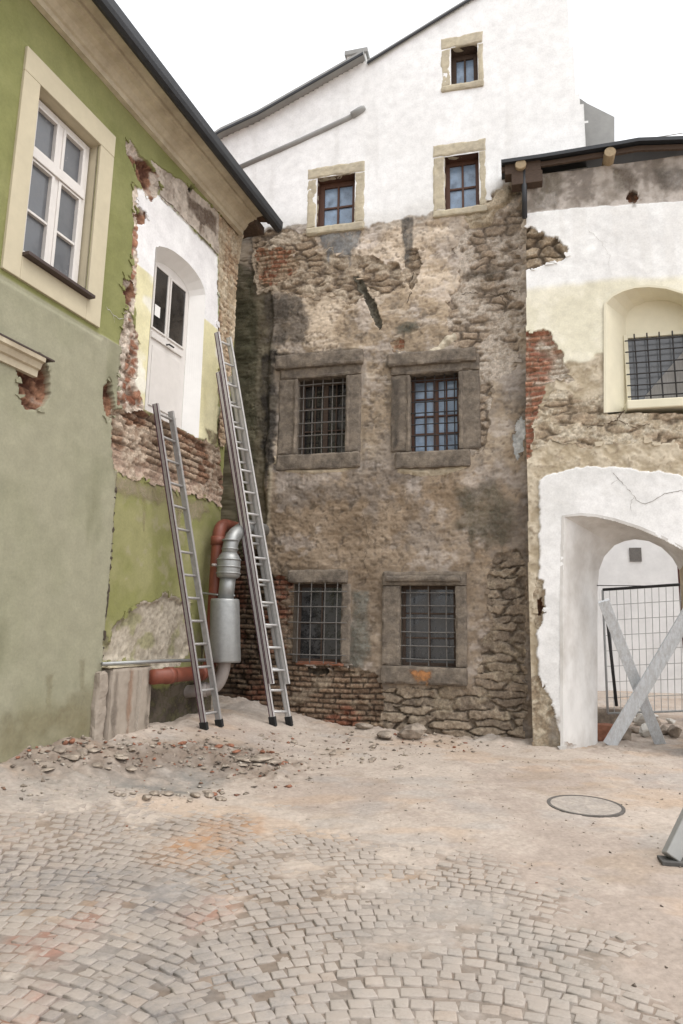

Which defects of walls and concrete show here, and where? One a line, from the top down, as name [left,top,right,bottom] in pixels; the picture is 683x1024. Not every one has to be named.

spalling [15,366,52,413]
spalling [102,137,425,510]
spalling [445,192,683,460]
crack [613,473,682,504]
peeling [103,589,195,669]
spalling [214,540,566,750]